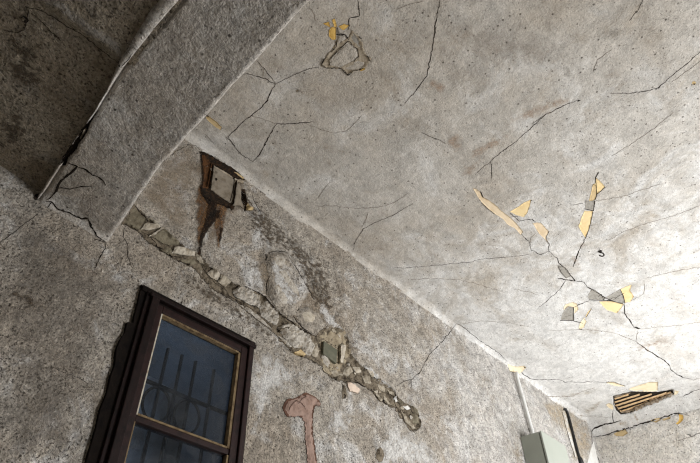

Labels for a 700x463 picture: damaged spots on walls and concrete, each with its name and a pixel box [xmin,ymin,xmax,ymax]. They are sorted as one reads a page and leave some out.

spalling [321,19,371,76]
crack [405,2,440,103]
crack [172,63,360,160]
crack [0,162,106,268]
corrosion [196,152,234,255]
spalling [473,188,532,235]
spalling [579,172,606,237]
spalling [560,302,591,330]
spalling [587,285,634,313]
crack [554,267,700,396]
spalling [606,382,679,413]
crack [580,412,689,463]